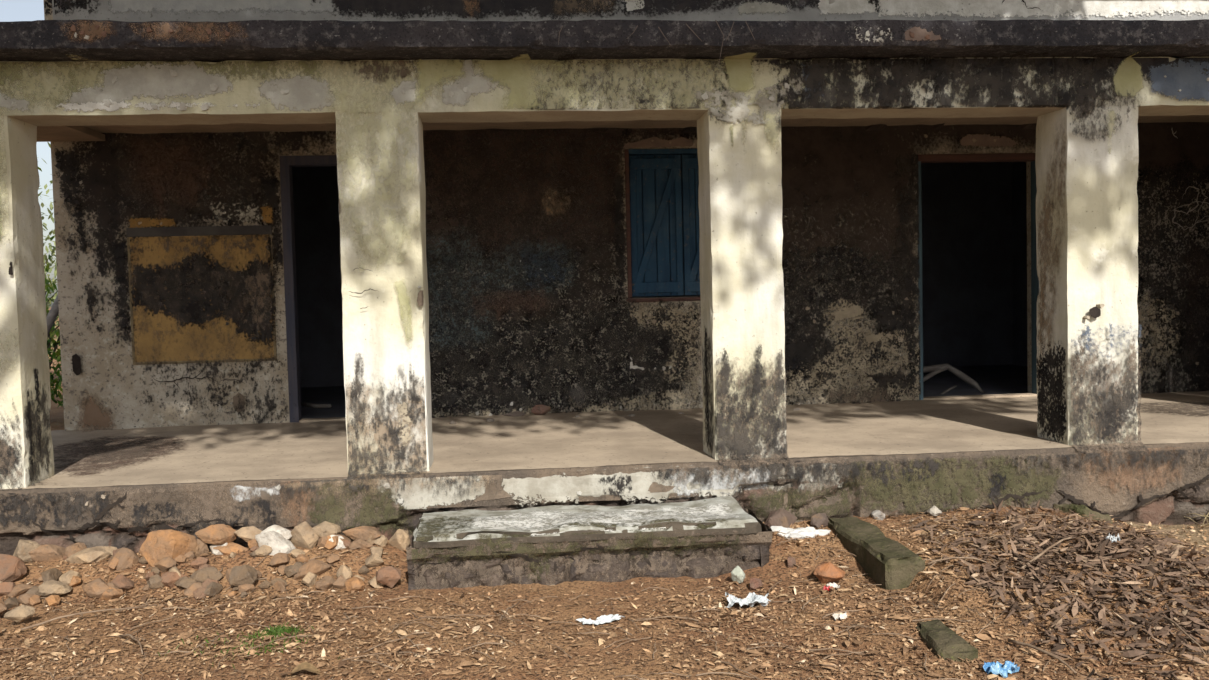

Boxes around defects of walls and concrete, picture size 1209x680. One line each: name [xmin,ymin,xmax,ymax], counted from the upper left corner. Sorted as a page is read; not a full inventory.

peeling [56,61,336,112]
damp [751,51,1209,153]
damp [0,368,117,528]
damp [52,130,336,346]
peeling [128,217,277,363]
damp [142,358,288,424]
peeling [209,202,274,224]
damp [276,127,921,552]
damp [988,142,1209,503]